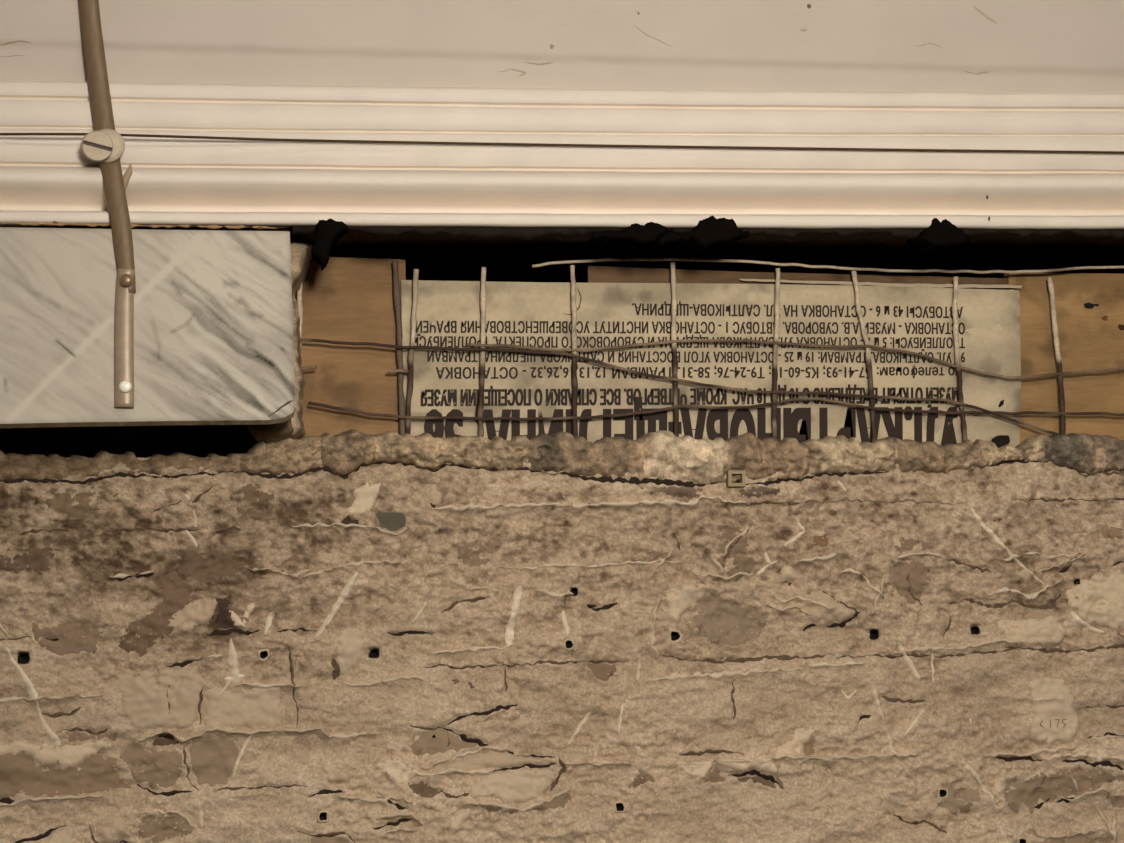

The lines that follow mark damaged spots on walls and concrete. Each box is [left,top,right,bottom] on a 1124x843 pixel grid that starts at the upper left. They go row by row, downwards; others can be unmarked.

spalling [311,219,349,271]
spalling [586,215,750,253]
spalling [246,419,295,442]
crack [0,462,963,561]
crack [1014,471,1124,503]
crack [663,555,1124,720]
crack [857,696,925,725]
spalling [377,726,478,798]
crack [680,749,782,789]
crack [996,705,1124,770]
flaking render [449,769,572,836]
crack [893,814,947,833]